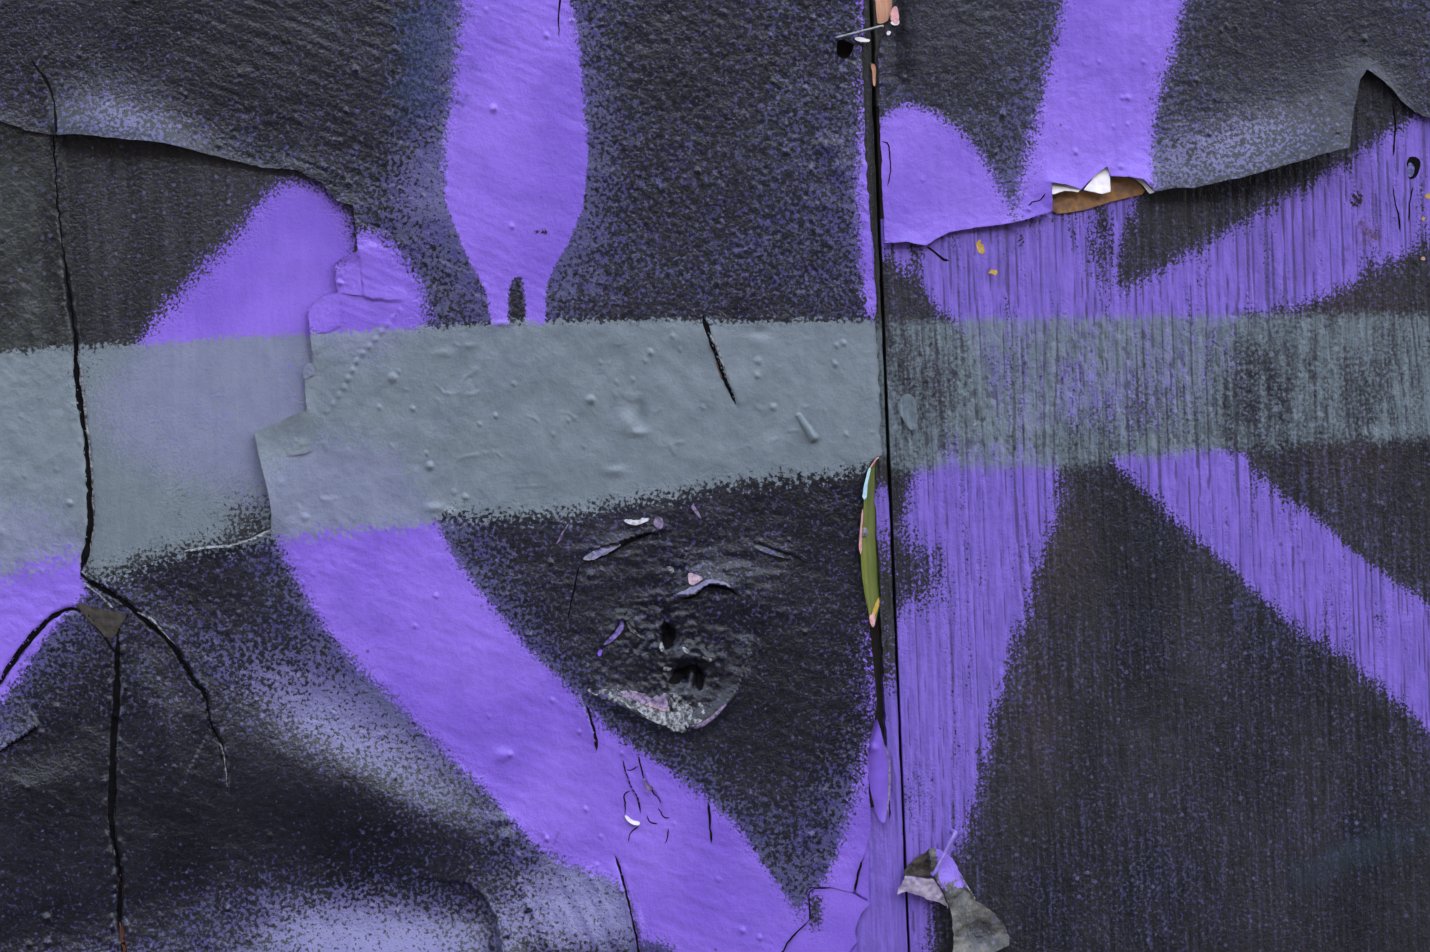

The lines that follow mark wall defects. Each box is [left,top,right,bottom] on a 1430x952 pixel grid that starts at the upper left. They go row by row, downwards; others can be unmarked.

peeling [0,121,363,580]
crack [702,316,736,404]
crack [0,58,228,952]
peeling [568,516,664,618]
peeling [666,566,736,599]
peeling [753,545,792,558]
peeling [859,70,1430,952]
peeling [588,620,727,733]